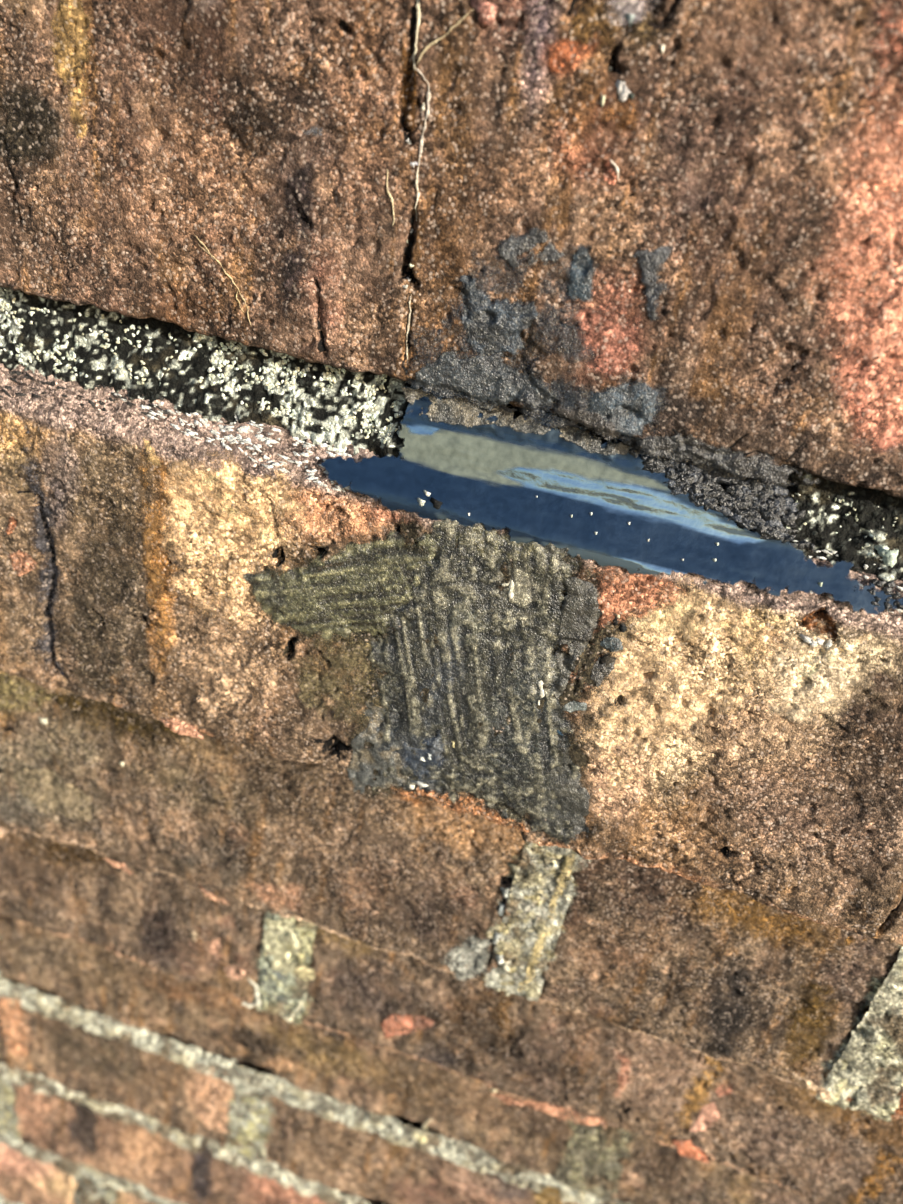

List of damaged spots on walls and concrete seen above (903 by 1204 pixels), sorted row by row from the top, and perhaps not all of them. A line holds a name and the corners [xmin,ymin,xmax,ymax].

crack [386,0,472,386]
crack [453,394,635,440]
crack [17,425,70,682]
crack [879,897,903,928]